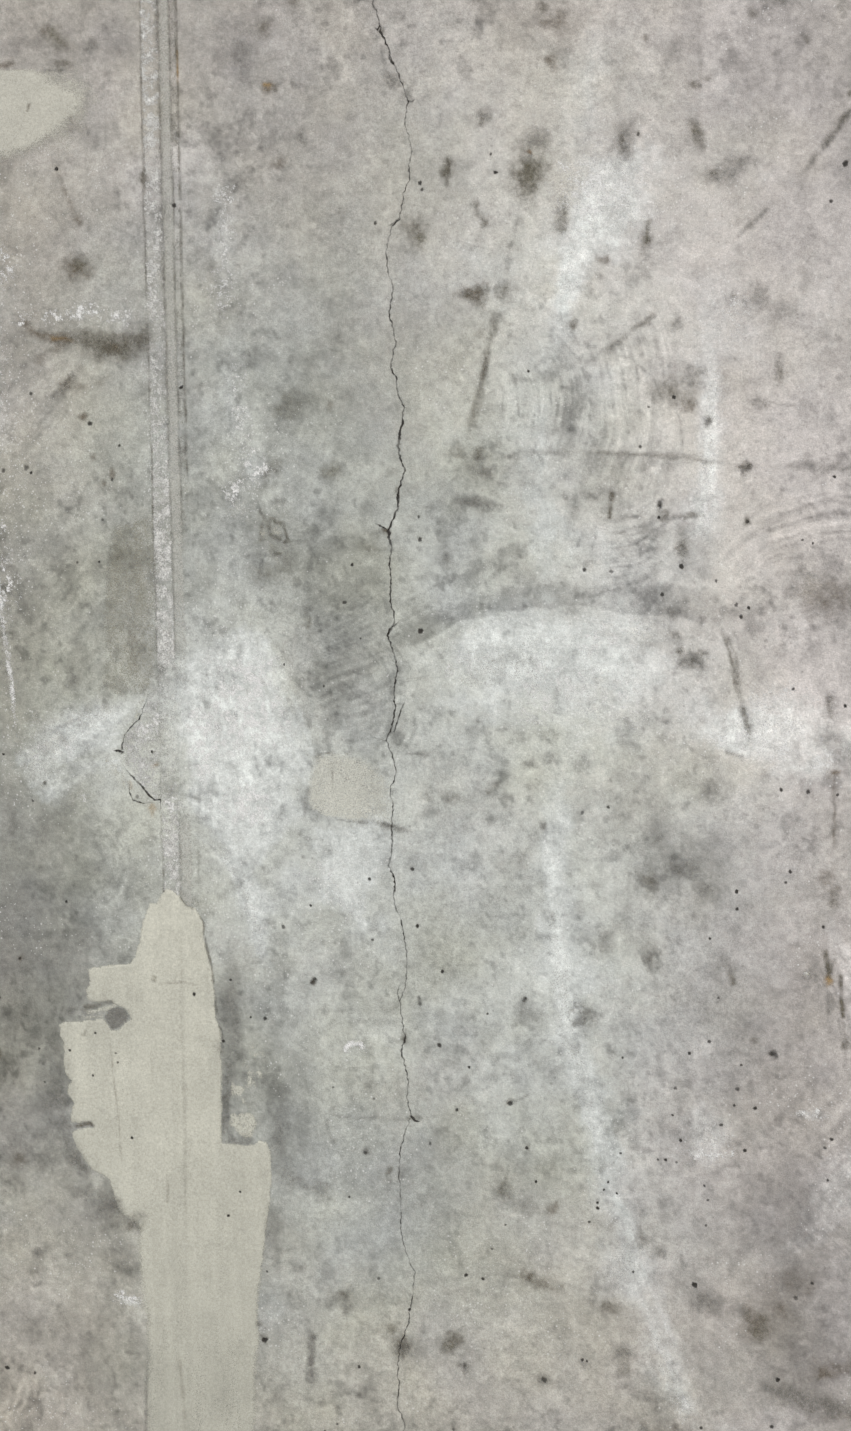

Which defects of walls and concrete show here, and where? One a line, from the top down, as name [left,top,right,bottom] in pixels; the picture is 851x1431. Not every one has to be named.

peeling [229,1046,267,1138]
crack [376,9,419,1178]